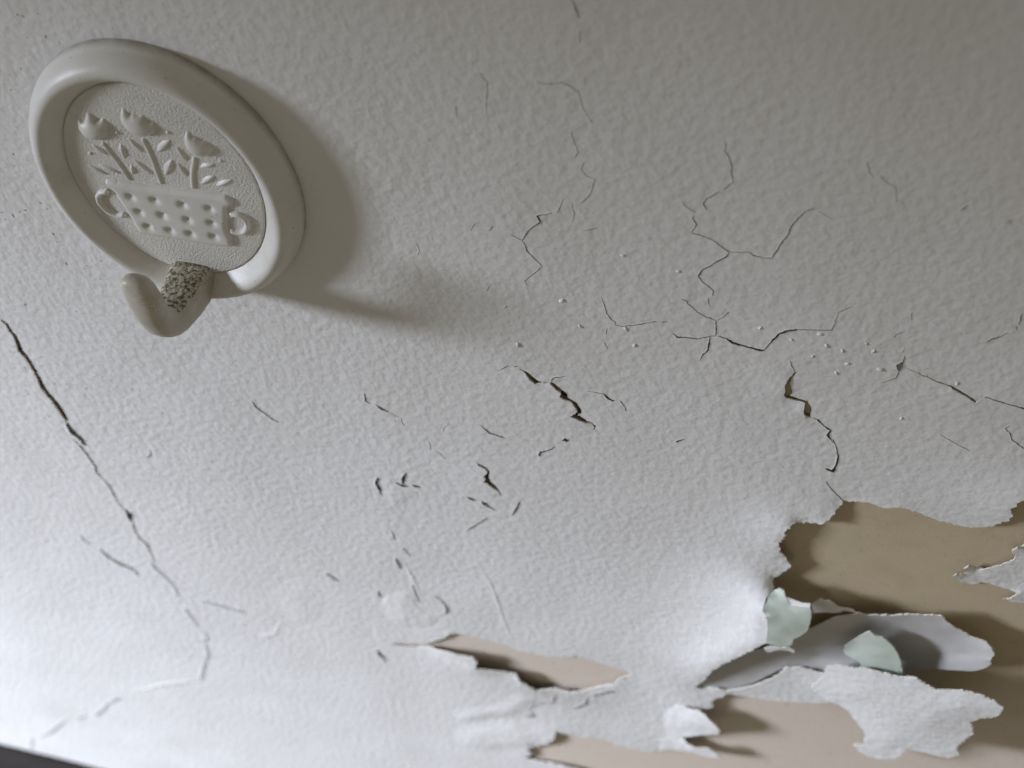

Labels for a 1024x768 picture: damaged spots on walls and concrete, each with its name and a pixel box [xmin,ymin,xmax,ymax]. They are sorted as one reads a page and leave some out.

crack [470,80,597,286]
crack [600,142,851,501]
crack [883,313,926,383]
crack [363,393,405,426]
crack [480,425,505,439]
crack [497,365,627,457]
crack [983,396,1024,450]
crack [7,323,246,681]
crack [373,472,421,497]
crack [466,470,521,531]
peeling [434,633,627,685]
peeling [529,501,1024,768]